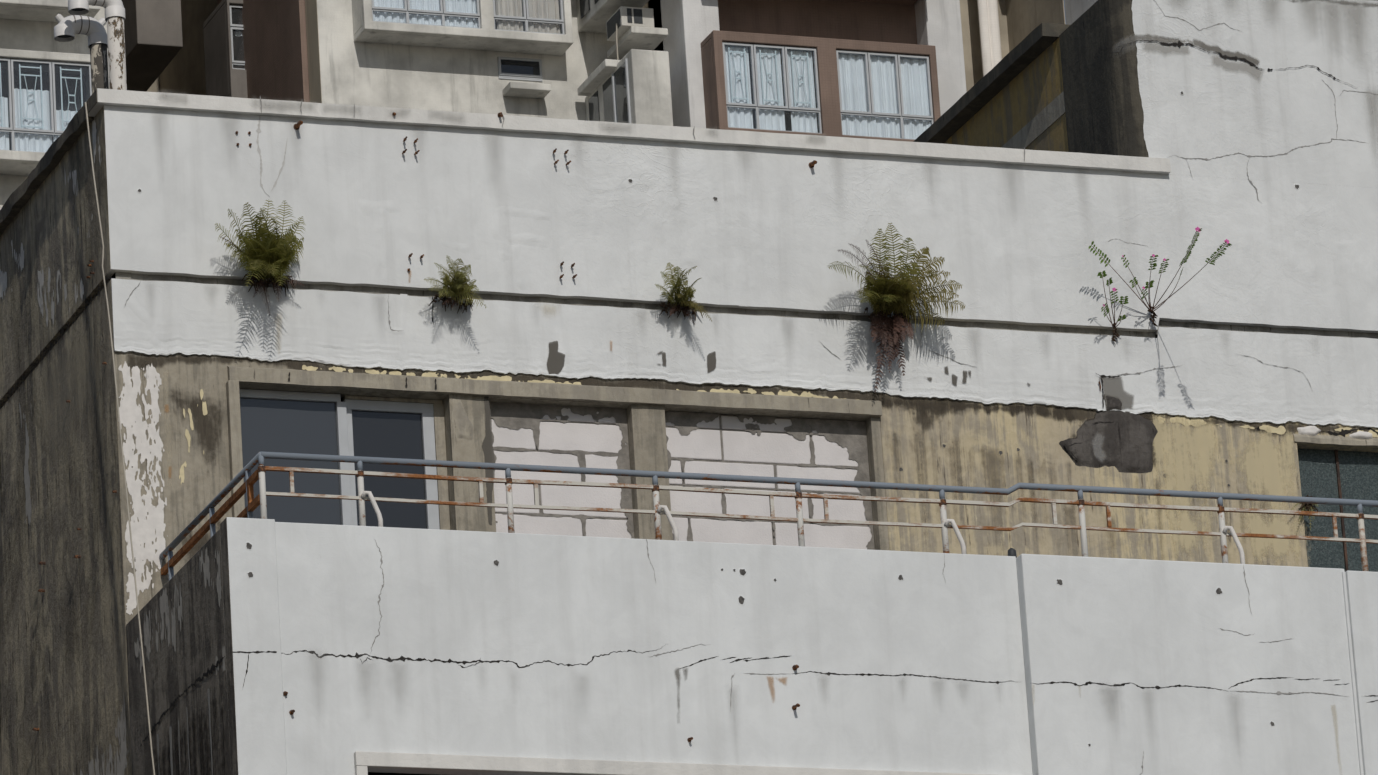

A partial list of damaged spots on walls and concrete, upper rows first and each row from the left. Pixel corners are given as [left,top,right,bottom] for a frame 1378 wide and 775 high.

crack [1115,1,1378,200]
peeling [118,361,208,673]
water stain [155,690,225,775]
peeling [199,548,221,607]
crack [141,540,1378,745]